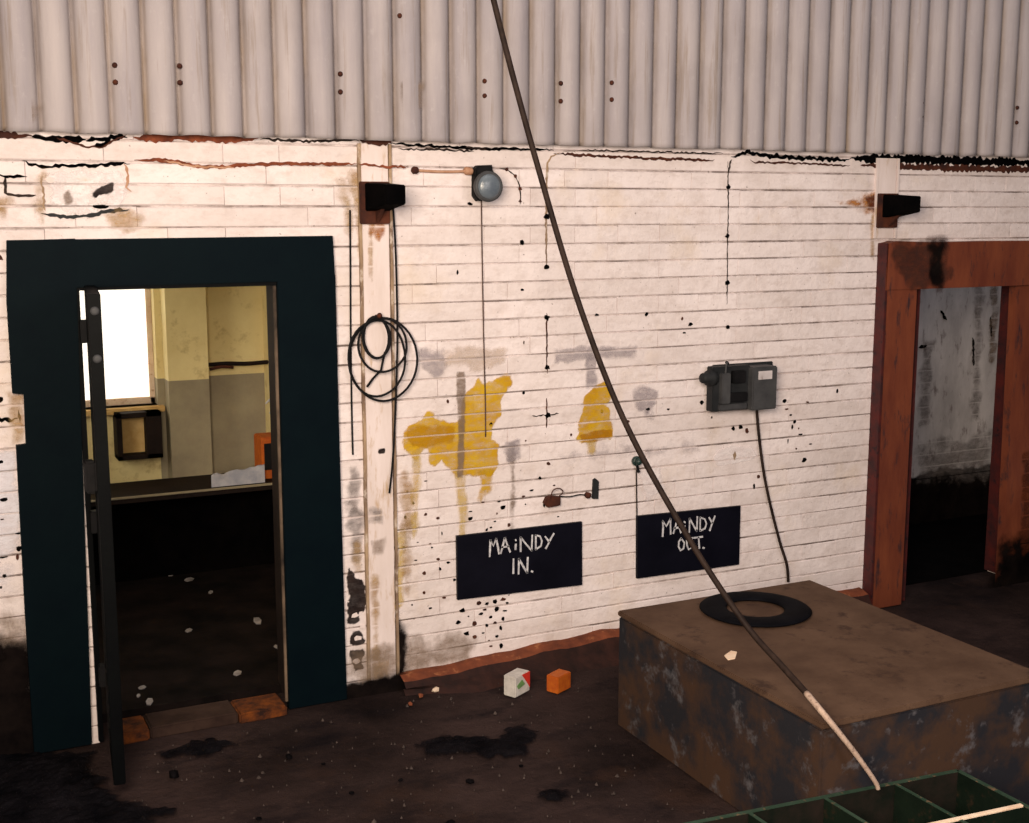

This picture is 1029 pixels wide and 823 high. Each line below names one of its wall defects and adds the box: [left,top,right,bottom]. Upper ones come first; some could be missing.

crack [0,131,1029,294]
rust [849,192,875,255]
crack [543,315,551,372]
crack [533,398,559,428]